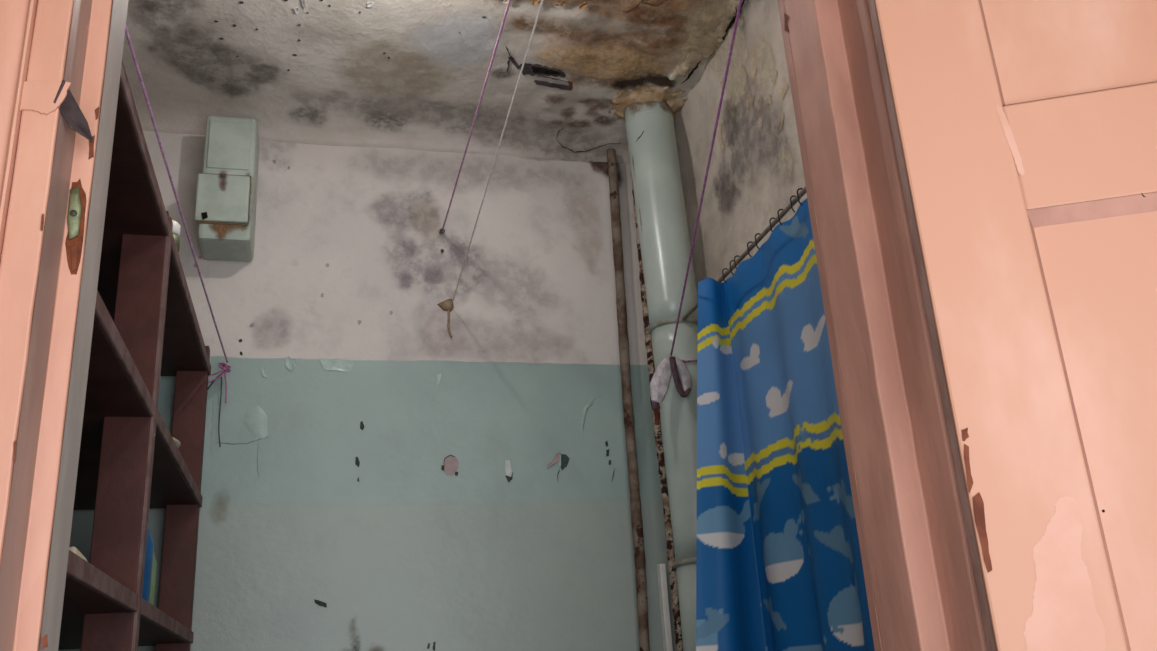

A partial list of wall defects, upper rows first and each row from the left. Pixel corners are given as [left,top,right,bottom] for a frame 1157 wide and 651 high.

spalling [495,47,573,91]
spalling [608,71,688,122]
peeling [708,17,788,153]
damp [716,96,784,208]
peeling [441,455,459,476]
peeling [505,460,513,482]
peeling [547,452,569,478]